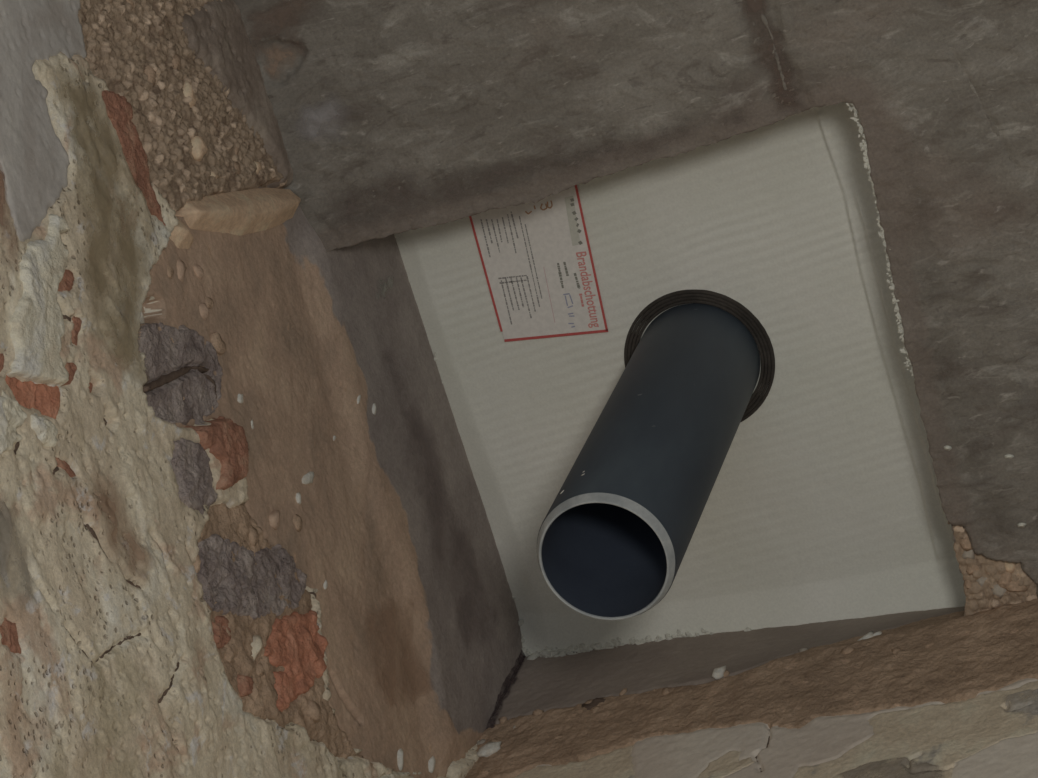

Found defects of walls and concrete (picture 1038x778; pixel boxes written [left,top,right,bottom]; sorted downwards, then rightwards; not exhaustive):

crack [754,0,788,96]
flaking render [102,90,1038,778]